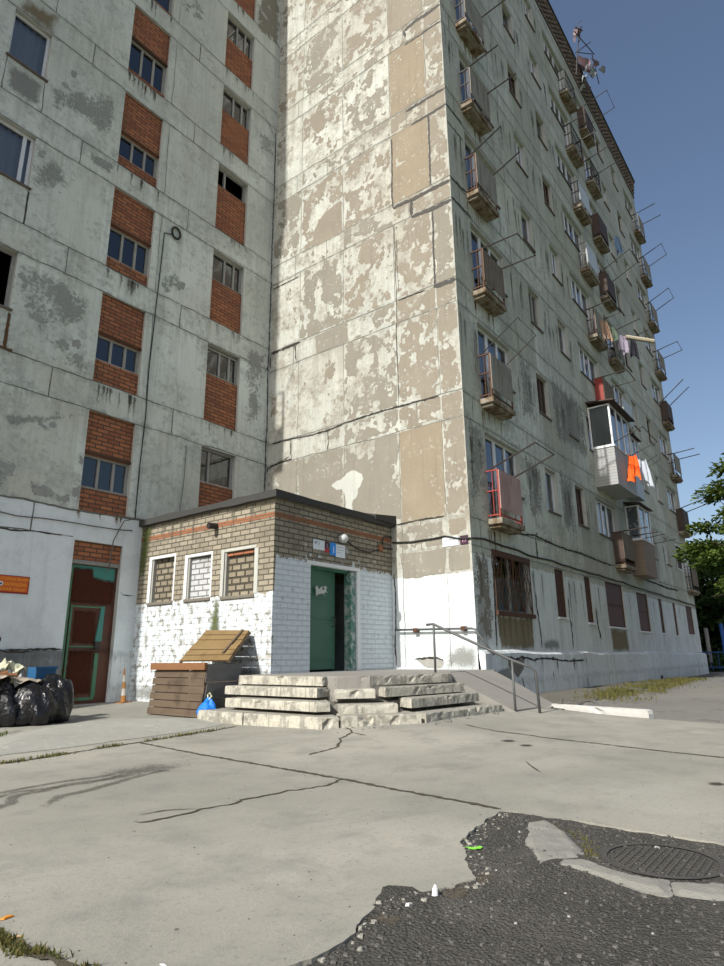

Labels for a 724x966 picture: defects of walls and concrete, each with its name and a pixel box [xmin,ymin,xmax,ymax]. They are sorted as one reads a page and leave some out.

peeling [258,0,493,643]
peeling [247,351,288,418]
crack [310,728,364,755]
crack [136,779,341,822]
spalling [525,820,724,901]